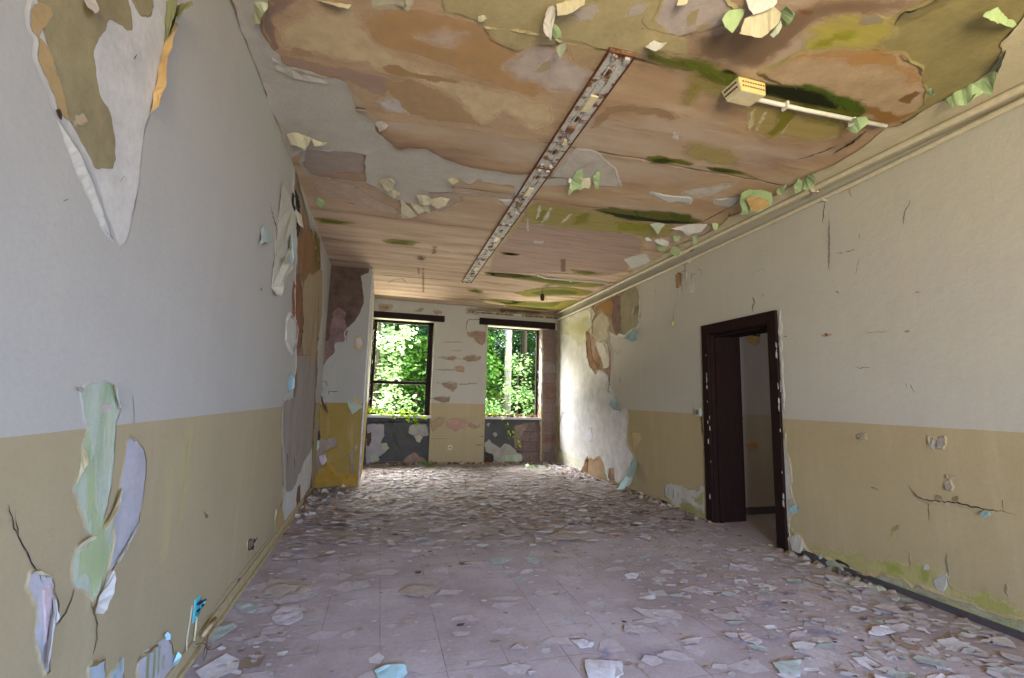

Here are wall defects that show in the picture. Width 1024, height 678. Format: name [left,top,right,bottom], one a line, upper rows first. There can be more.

peeling [24,0,194,250]
flaking render [233,0,795,522]
peeling [484,0,1024,489]
peeling [8,379,147,678]
peeling [85,632,182,678]
flaking render [780,429,1024,632]
crack [908,485,1017,520]